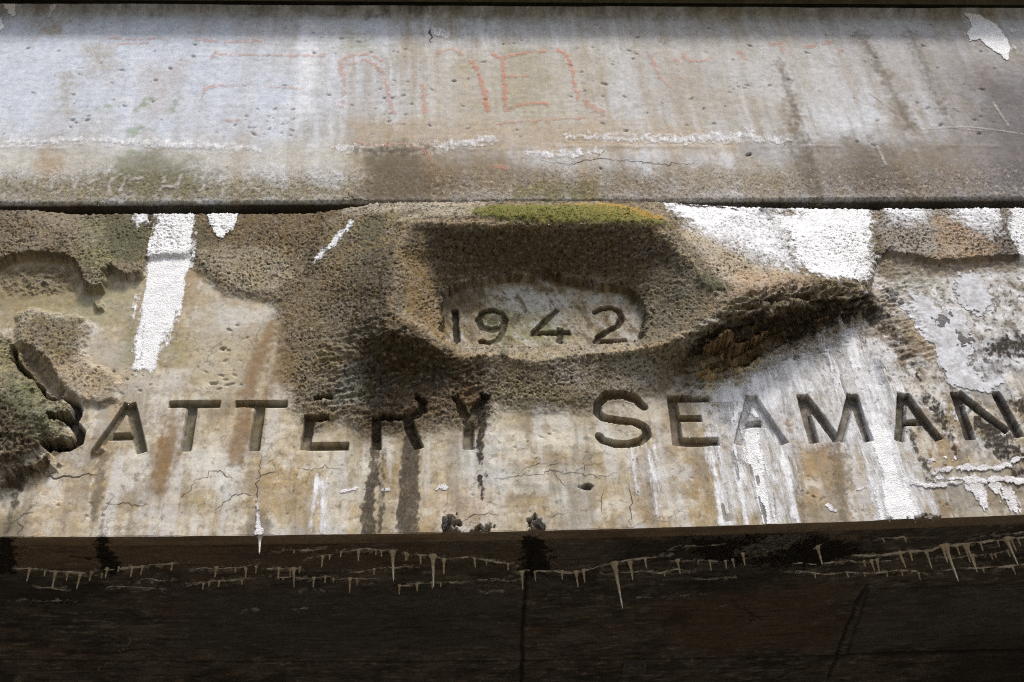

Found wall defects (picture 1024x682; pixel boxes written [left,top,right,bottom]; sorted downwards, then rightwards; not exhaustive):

peeling [964,12,1016,60]
spalling [681,248,1019,393]
spalling [0,331,78,476]
damp [0,202,1024,609]
crack [29,468,145,513]
crack [181,460,335,511]
crack [485,462,633,526]